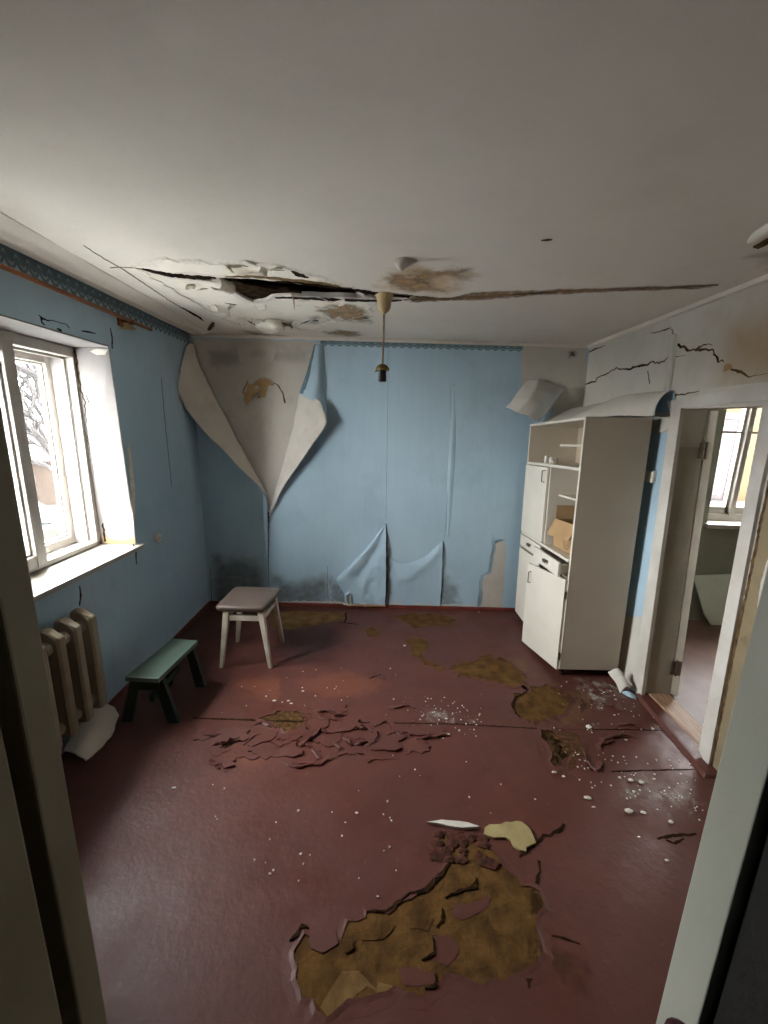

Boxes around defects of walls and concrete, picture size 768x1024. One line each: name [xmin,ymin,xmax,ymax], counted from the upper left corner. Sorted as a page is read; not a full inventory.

leakage [363,257,502,301]
crack [410,284,719,302]
flaking render [112,253,381,511]
flaking render [521,346,586,423]
crack [585,328,768,385]
peeling [446,653,578,776]
peeling [281,826,558,1024]